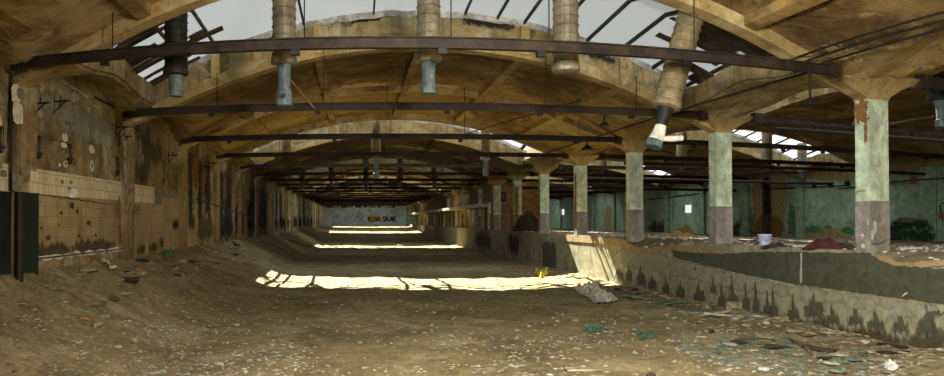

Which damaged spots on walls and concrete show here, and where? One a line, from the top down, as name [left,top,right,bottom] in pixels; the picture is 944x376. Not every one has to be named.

spalling [0,84,24,126]
damp [39,239,115,261]
damp [173,152,312,245]
spalling [787,205,944,268]
damp [890,218,935,241]
damp [615,248,944,349]